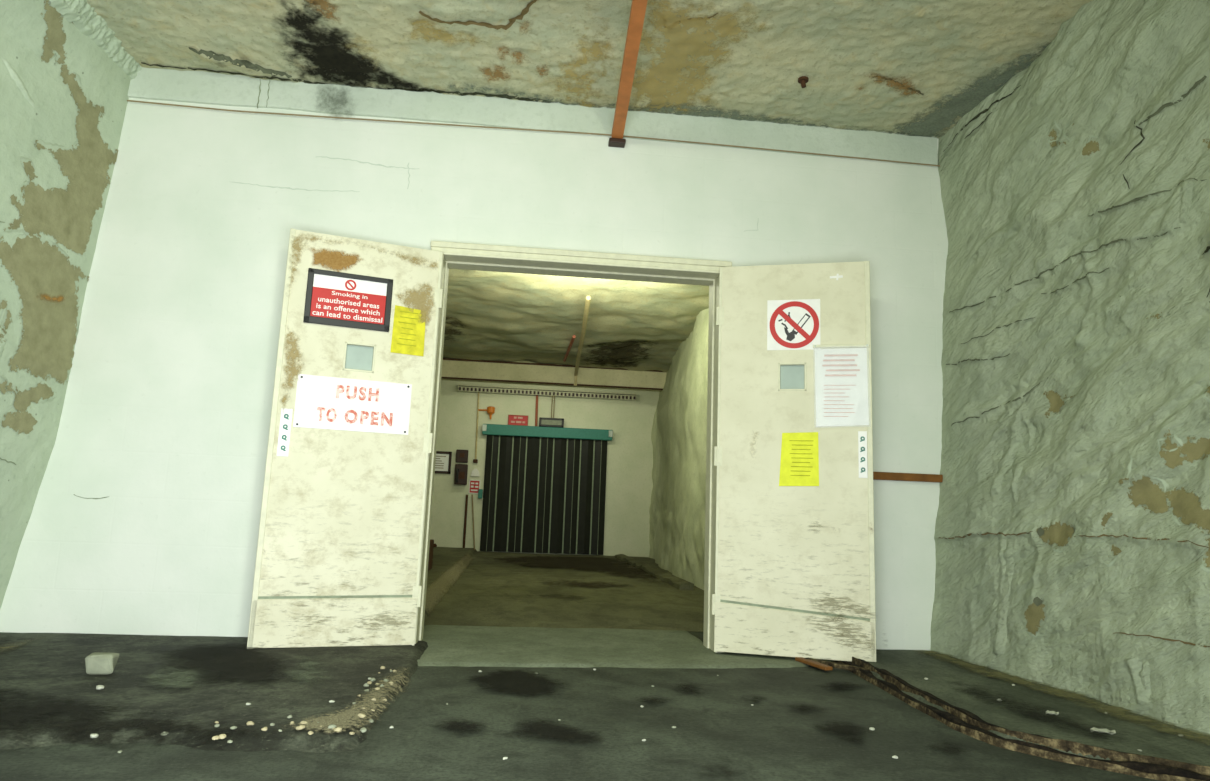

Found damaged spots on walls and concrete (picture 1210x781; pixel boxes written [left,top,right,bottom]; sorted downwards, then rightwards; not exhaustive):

crack [419,0,537,30]
crack [943,85,1021,152]
crack [1090,76,1206,216]
peeling [0,0,118,434]
crack [946,227,1181,365]
crack [952,378,1048,425]
peeling [1043,390,1075,420]
peeling [1118,429,1210,572]
peeling [1036,521,1074,553]
peeling [1024,597,1045,638]
water stain [148,645,283,687]